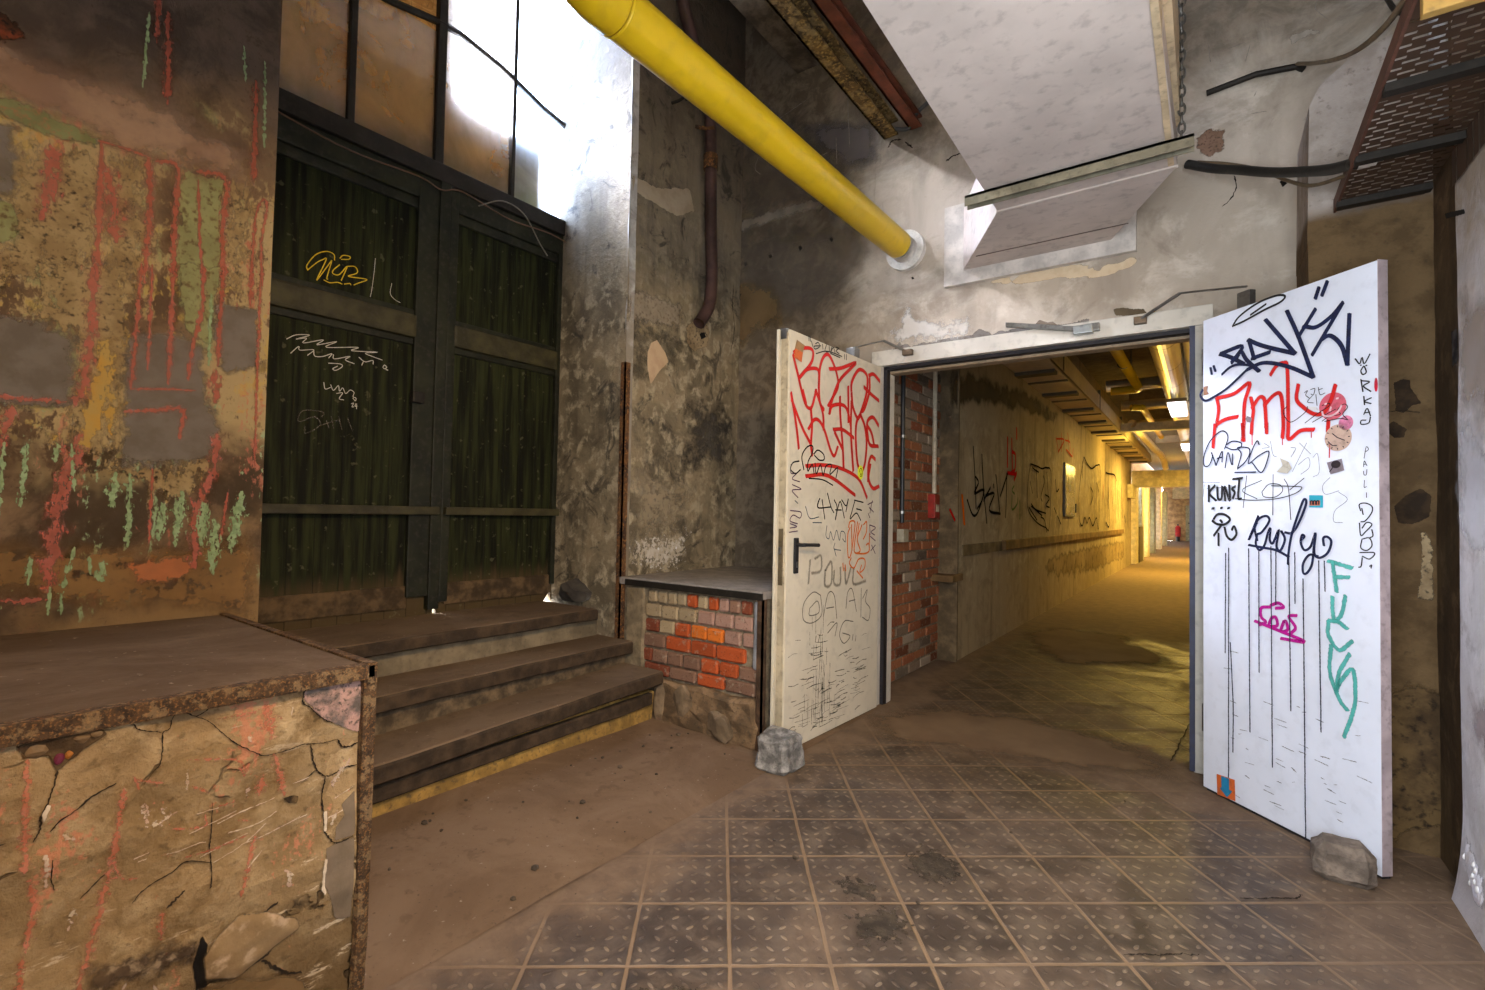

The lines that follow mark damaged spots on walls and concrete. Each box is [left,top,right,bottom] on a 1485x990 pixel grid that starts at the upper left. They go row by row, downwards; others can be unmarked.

spalling [896,319,1089,349]
crack [133,691,358,844]
crack [0,771,116,899]
crack [132,803,213,909]
crack [205,950,302,982]